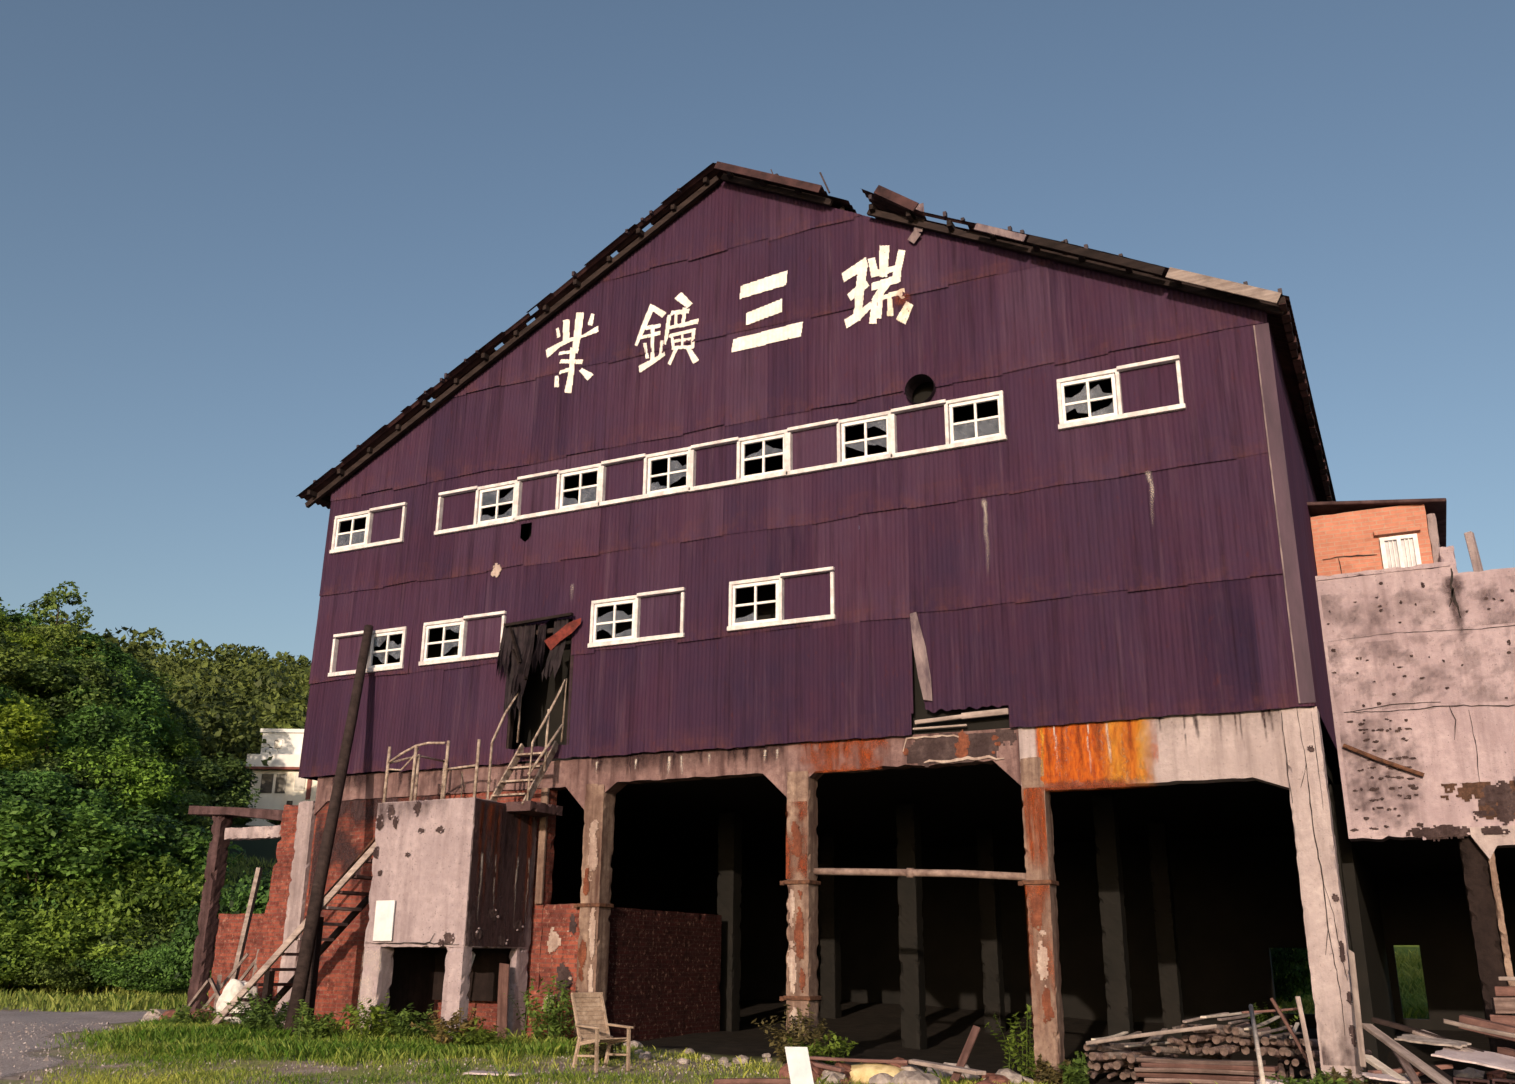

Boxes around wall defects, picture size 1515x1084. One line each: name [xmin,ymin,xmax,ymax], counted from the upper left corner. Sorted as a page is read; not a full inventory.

corrosion [786,834,807,879]
corrosion [805,737,885,773]
corrosion [1024,719,1155,860]
spalling [1346,693,1515,841]